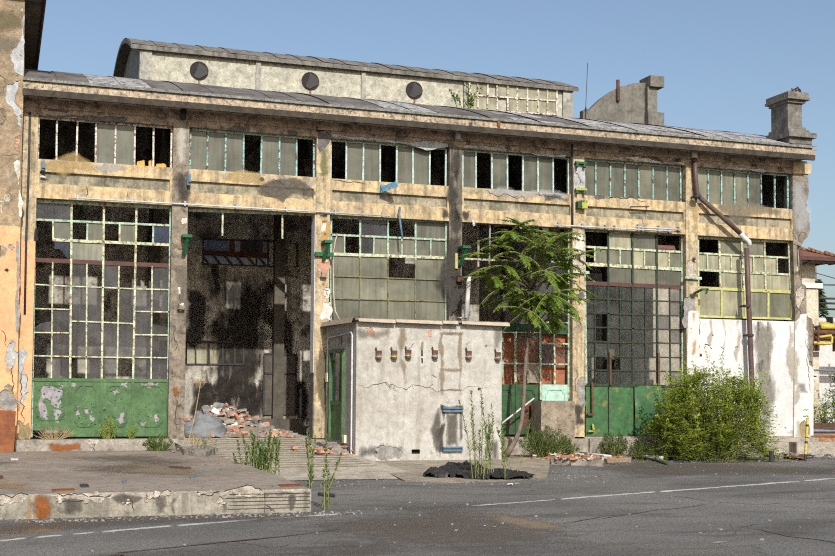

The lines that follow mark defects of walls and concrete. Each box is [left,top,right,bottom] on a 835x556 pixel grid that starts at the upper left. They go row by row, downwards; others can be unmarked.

peeling [0,8,25,217]
spalling [795,286,805,308]
peeling [0,241,127,439]
crack [358,375,496,392]
damp [438,333,462,394]
damp [755,322,775,433]
damp [788,326,805,403]
damp [432,406,463,452]
spalling [0,492,28,506]
corrosion [35,495,50,519]
spalling [54,491,111,504]
spalling [197,484,264,507]